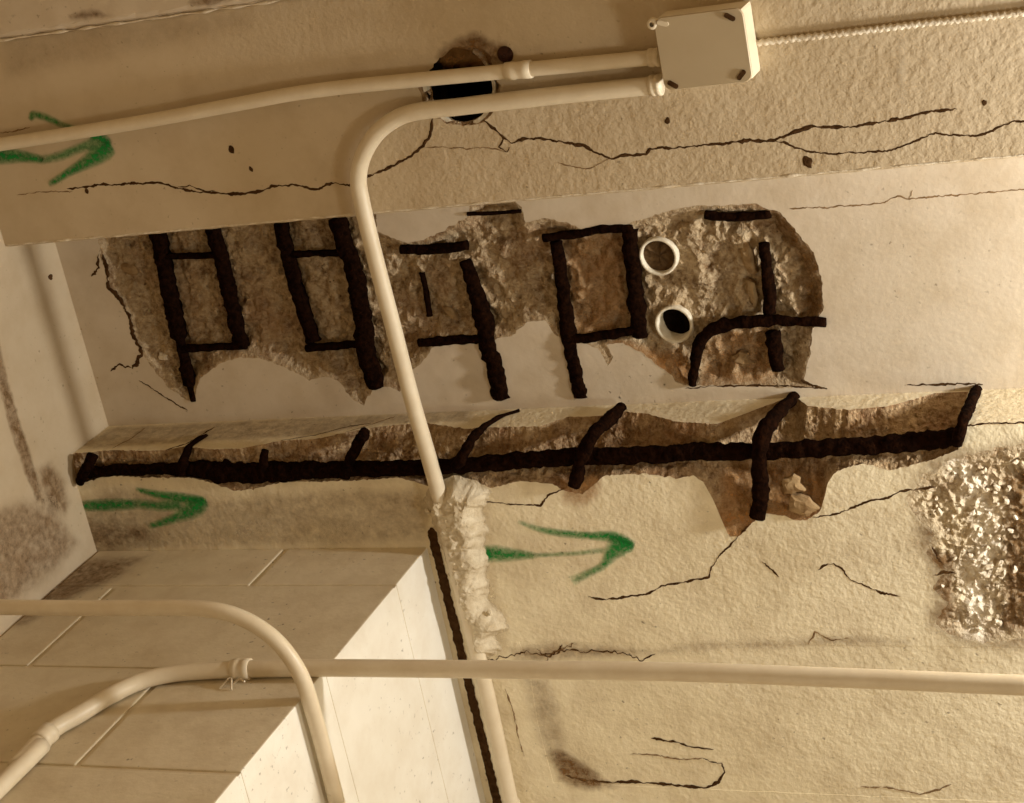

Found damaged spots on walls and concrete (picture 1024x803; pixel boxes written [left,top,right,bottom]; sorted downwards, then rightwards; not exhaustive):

crack [18,108,1024,196]
spalling [98,216,401,405]
rust [773,211,823,329]
rust [645,354,689,380]
leakage [0,365,64,507]
spalling [73,424,428,491]
spalling [373,202,1024,644]
rust [766,468,820,516]
crack [816,486,936,518]
crack [589,524,751,600]
crack [428,528,655,803]
crack [565,737,725,789]